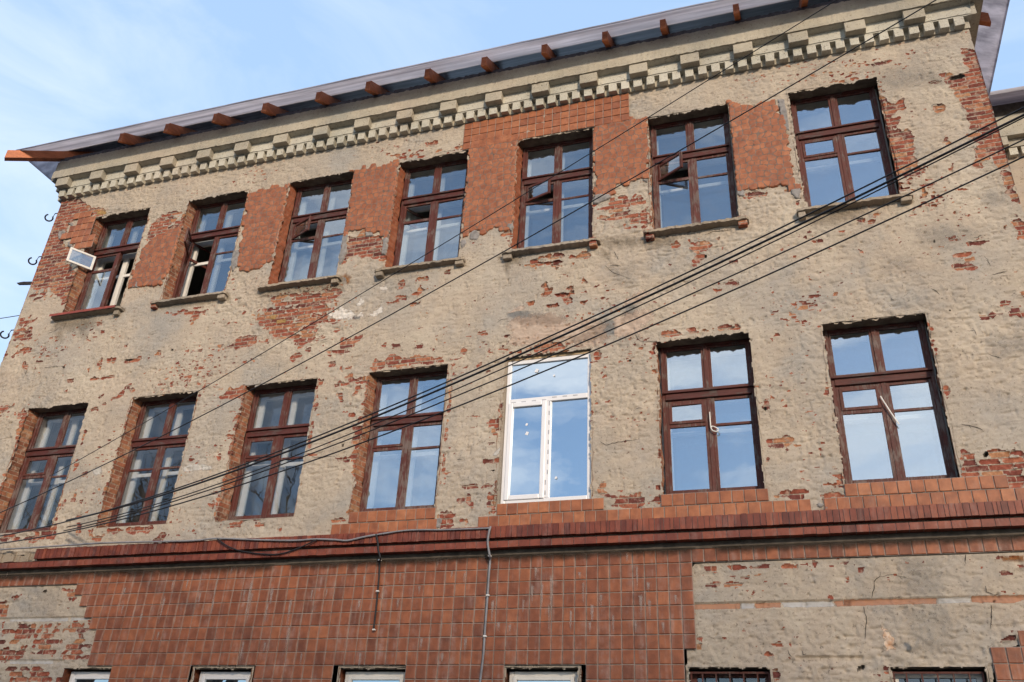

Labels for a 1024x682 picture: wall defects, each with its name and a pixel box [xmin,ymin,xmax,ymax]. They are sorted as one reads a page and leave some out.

spalling [730,44,990,276]
spalling [927,48,1024,240]
spalling [29,198,108,306]
spalling [146,211,186,241]
spalling [338,229,387,267]
spalling [592,180,653,229]
spalling [761,272,853,341]
spalling [0,251,741,543]
spalling [960,442,1024,489]
spalling [0,588,92,682]
spalling [756,627,802,682]